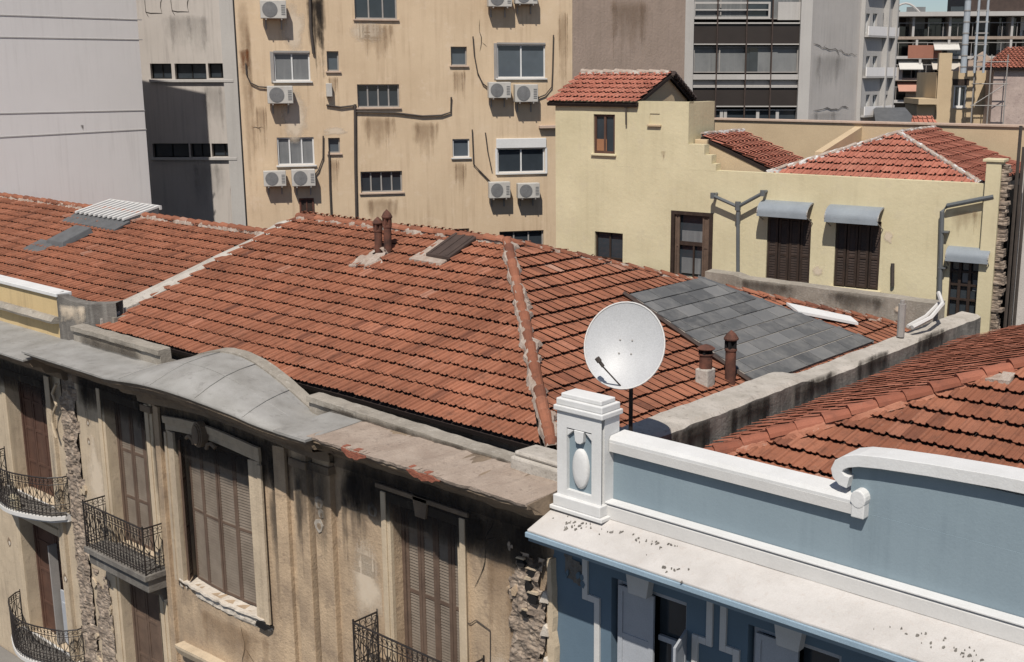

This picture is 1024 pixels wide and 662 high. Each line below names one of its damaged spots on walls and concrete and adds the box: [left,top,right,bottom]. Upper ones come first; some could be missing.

damp [674,423,709,447]
damp [732,398,769,432]
damp [795,373,833,399]
damp [859,352,887,377]
spalling [59,387,117,662]
damp [269,460,277,537]
damp [354,548,382,613]
spalling [506,541,585,662]